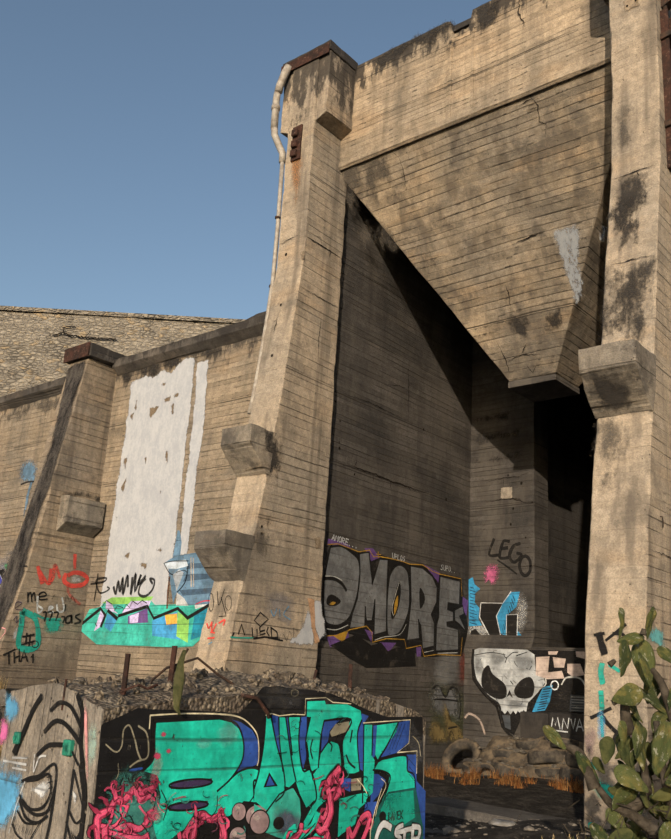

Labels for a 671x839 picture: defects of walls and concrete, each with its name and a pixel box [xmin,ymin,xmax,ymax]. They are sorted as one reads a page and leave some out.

damp [377,21,456,66]
damp [477,1,498,29]
damp [608,175,646,246]
damp [554,226,583,302]
peeling [100,358,209,607]